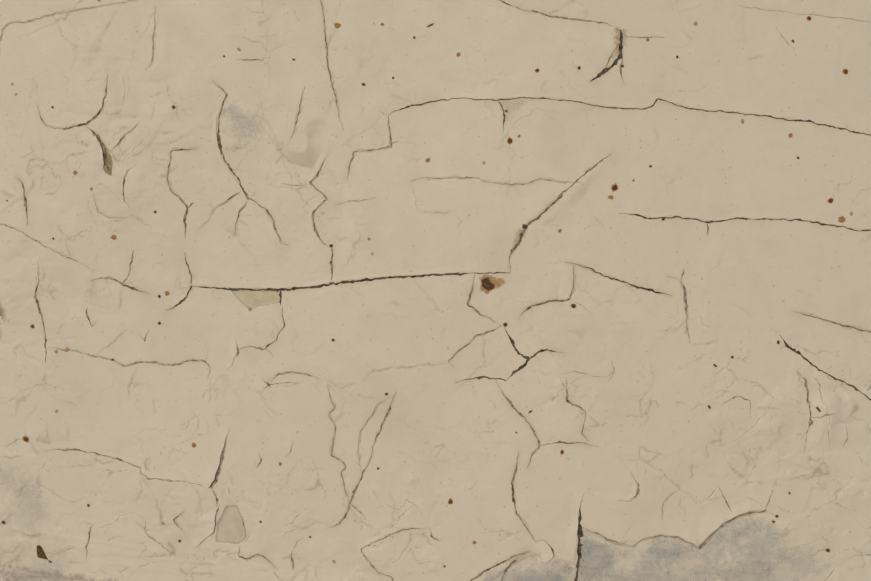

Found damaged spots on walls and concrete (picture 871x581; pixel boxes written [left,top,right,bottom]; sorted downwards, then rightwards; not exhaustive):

crack [38,73,108,130]
crack [0,177,149,294]
peeling [85,125,147,175]
crack [34,271,210,376]
crack [166,82,289,253]
peeling [233,290,280,310]
crack [171,153,690,581]
corrosion [480,276,504,293]
crack [348,0,871,174]
crack [618,207,871,233]
crack [781,333,871,451]
peeling [535,483,592,581]